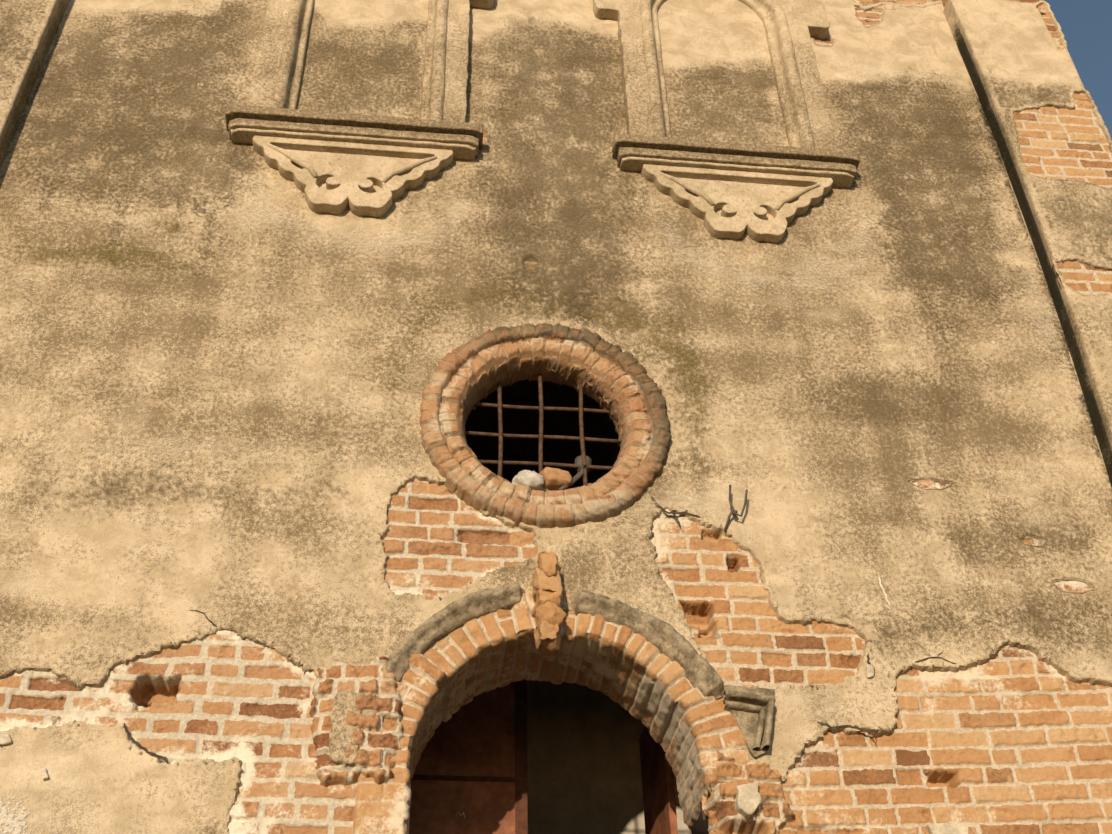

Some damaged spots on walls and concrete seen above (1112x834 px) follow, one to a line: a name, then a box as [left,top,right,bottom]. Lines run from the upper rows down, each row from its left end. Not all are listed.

leakage [11,2,260,241]
leakage [299,30,423,115]
leakage [469,17,636,330]
leakage [789,25,1112,501]
flaking render [1011,89,1112,190]
flaking render [1052,256,1112,297]
flaking render [0,623,357,834]
leakage [381,584,525,682]
flaking render [375,471,545,605]
leakage [571,590,723,700]
flaking render [644,503,874,692]
flaking render [775,635,1112,834]